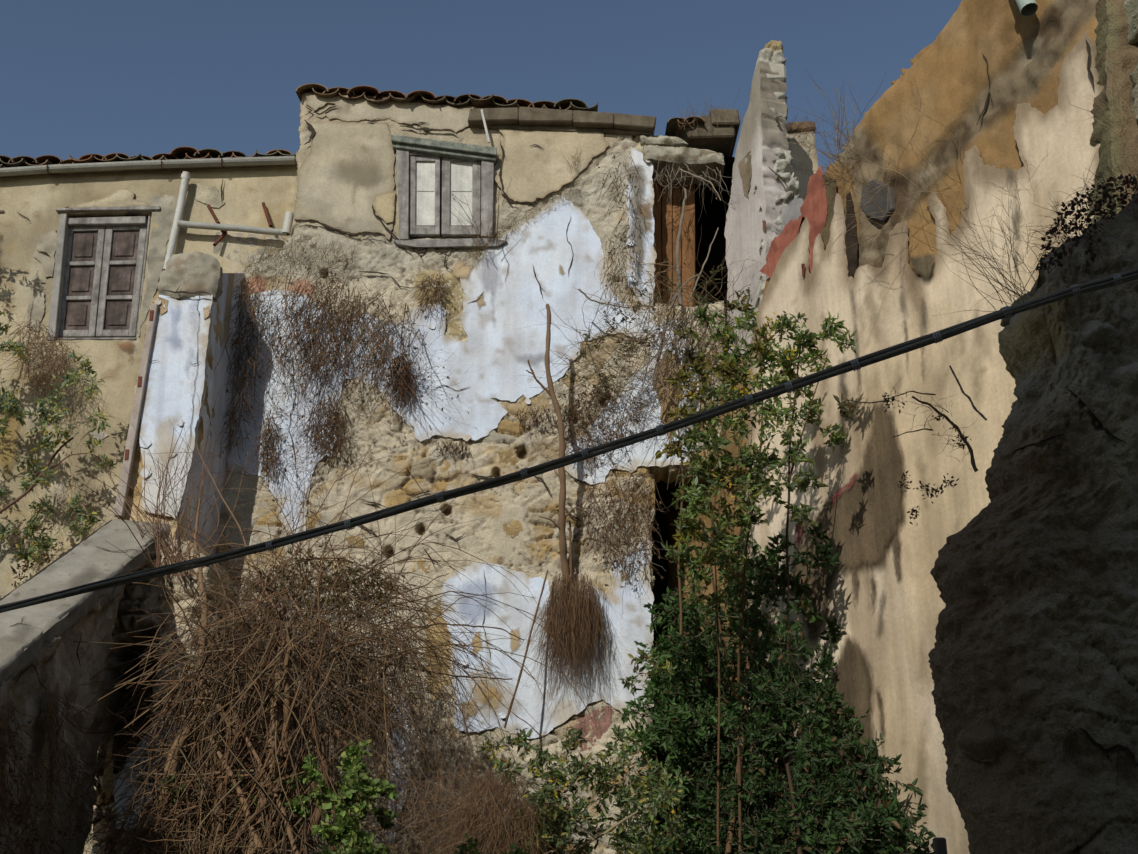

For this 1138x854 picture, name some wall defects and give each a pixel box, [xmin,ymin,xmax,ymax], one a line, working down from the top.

spalling [195,183,225,209]
spalling [213,232,285,264]
spalling [759,166,858,278]
spalling [909,253,934,277]
peeling [139,194,213,518]
flaking render [226,147,701,535]
spalling [503,520,523,539]
flaking render [424,539,654,752]